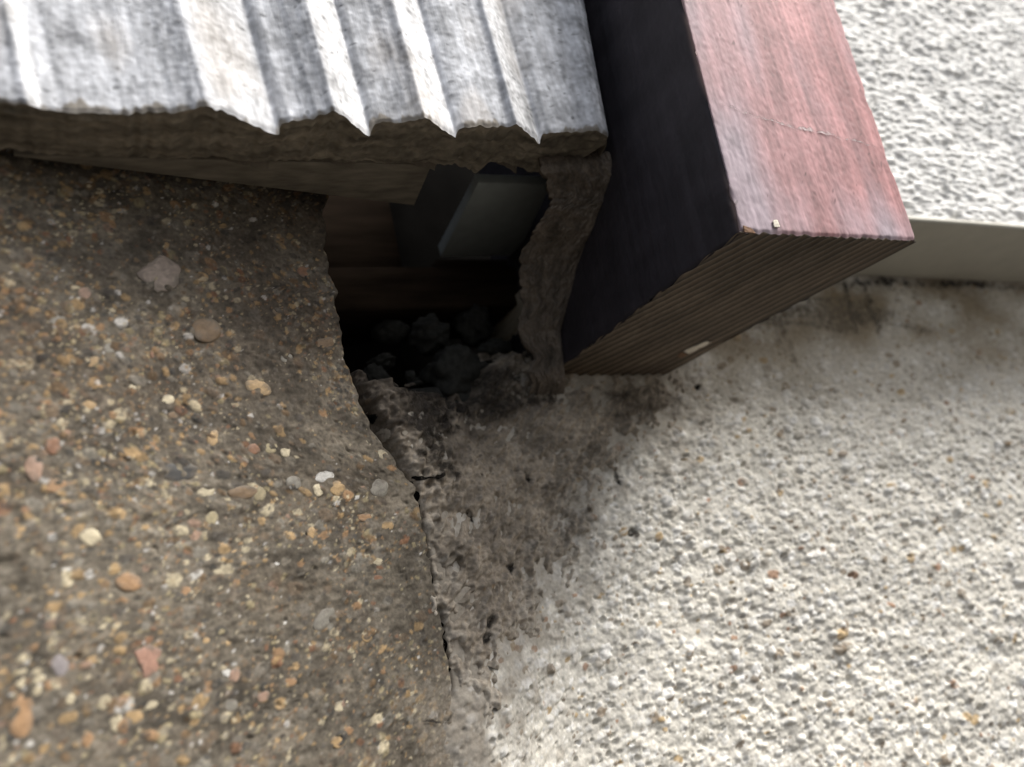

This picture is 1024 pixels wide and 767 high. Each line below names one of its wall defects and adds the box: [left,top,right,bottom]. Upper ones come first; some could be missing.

leakage [393,368,555,481]
crack [409,472,445,518]
crack [437,608,451,672]